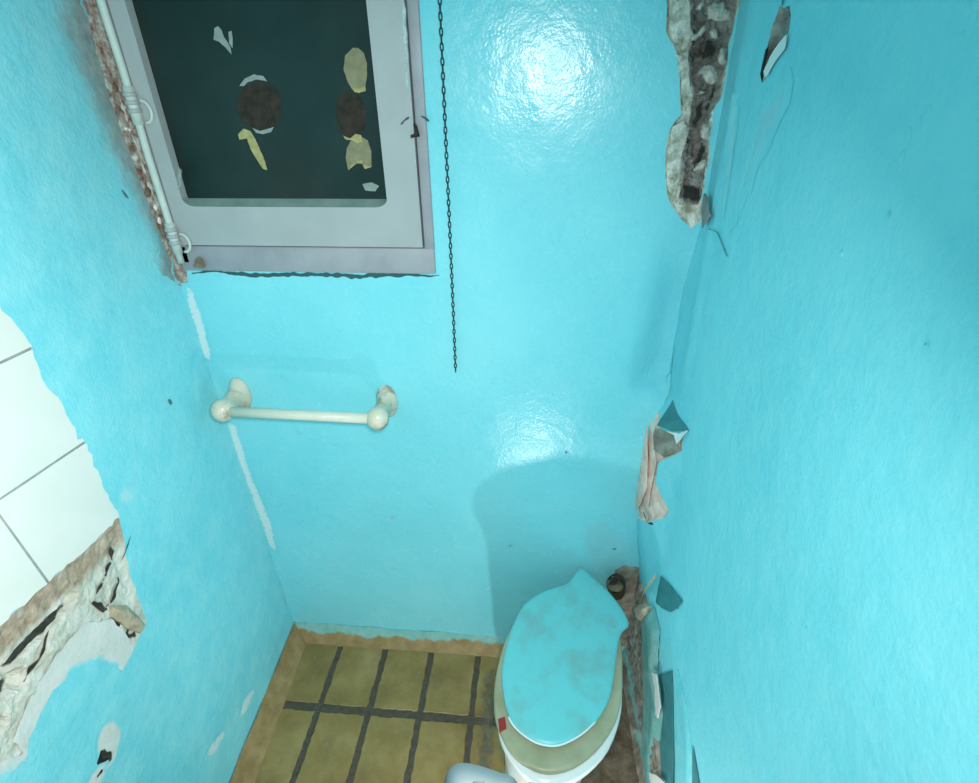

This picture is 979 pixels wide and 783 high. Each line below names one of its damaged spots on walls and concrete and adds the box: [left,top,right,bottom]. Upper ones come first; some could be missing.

spalling [0,518,147,783]